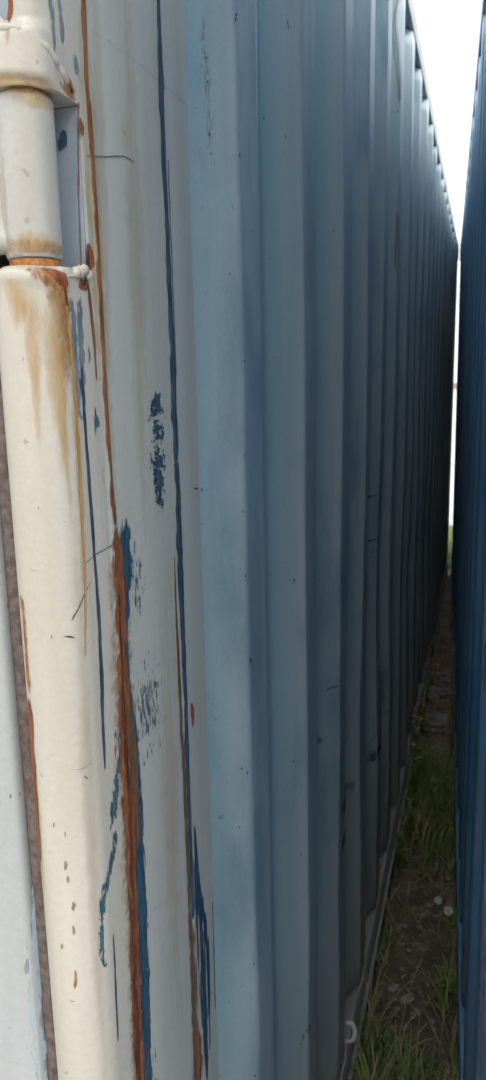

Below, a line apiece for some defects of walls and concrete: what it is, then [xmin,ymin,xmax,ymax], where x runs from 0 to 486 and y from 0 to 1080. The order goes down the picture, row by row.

peeling [0,0,13,22]
rust [1,76,43,101]
rust [19,236,57,252]
rust [27,0,145,1080]
peeling [129,541,145,615]
rust [20,598,41,860]
peeling [134,650,162,771]
peeling [99,723,123,967]